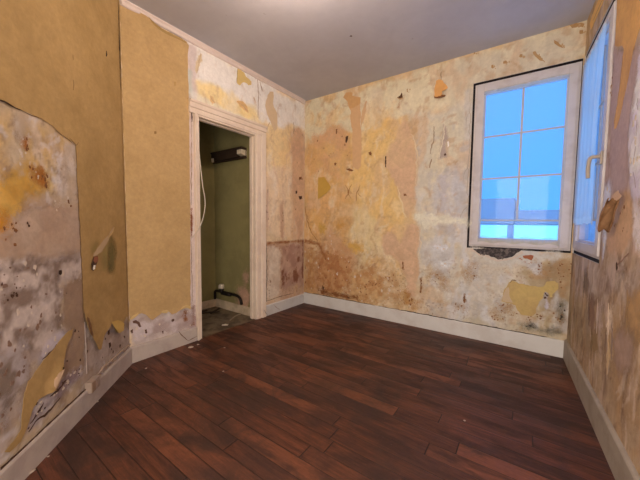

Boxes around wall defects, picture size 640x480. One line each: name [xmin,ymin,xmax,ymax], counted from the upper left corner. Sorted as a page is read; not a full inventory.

peeling [434,79,448,98]
flaking render [48,140,78,214]
flaking render [602,40,640,258]
flaking render [470,248,550,264]
flaking render [0,249,196,452]
water stain [521,299,568,336]